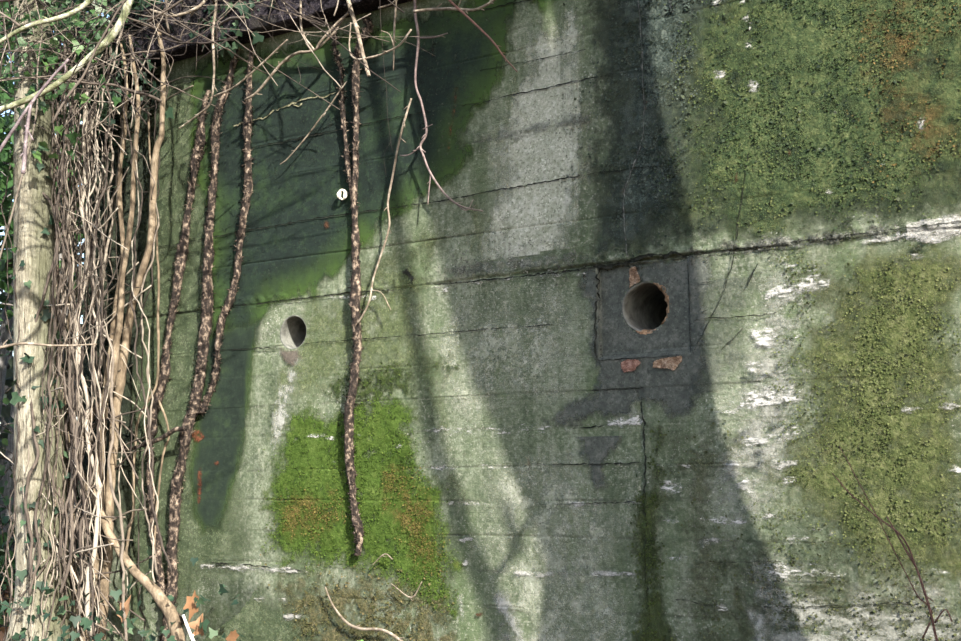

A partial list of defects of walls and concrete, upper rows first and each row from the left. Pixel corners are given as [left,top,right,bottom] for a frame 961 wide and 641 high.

water stain [480,12,592,261]
crack [130,0,957,361]
water stain [862,214,961,257]
water stain [191,320,259,532]
water stain [201,564,298,573]
crack [211,562,304,572]
water stain [493,460,634,641]
crack [541,387,650,628]
spalling [621,359,641,372]
spalling [652,356,682,371]
water stain [540,255,830,536]
crack [753,601,910,609]